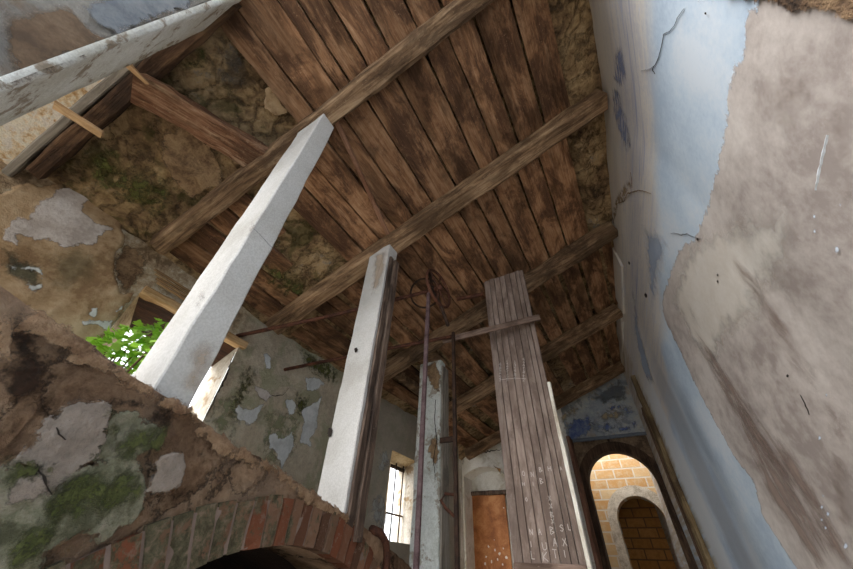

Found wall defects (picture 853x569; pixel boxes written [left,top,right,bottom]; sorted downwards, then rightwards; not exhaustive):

crack [642,10,683,74]
flaking render [0,184,145,339]
peeling [662,0,853,569]
flaking render [0,400,186,569]
peeling [235,386,272,425]
peeling [269,377,324,467]
peeling [428,434,439,464]